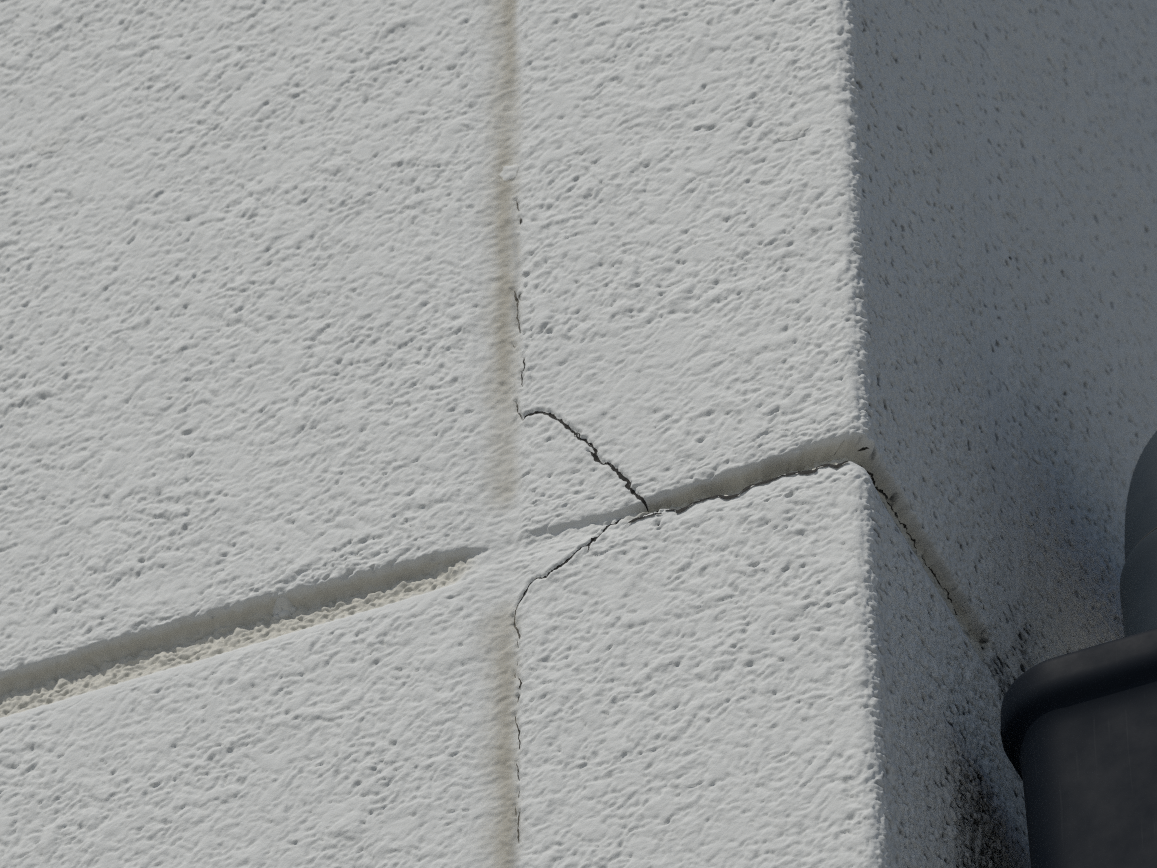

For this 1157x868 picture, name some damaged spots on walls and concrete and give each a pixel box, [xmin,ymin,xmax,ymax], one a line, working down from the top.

crack [512,291,957,842]